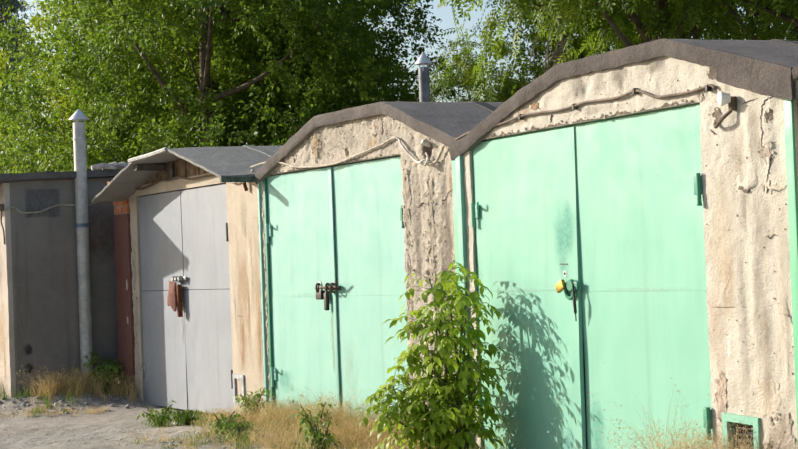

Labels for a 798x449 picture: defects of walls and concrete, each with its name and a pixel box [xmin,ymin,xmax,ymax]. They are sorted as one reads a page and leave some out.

spalling [483,90,705,139]
spalling [712,107,723,125]
spalling [268,129,322,175]
spalling [421,137,434,163]
crack [743,96,783,192]